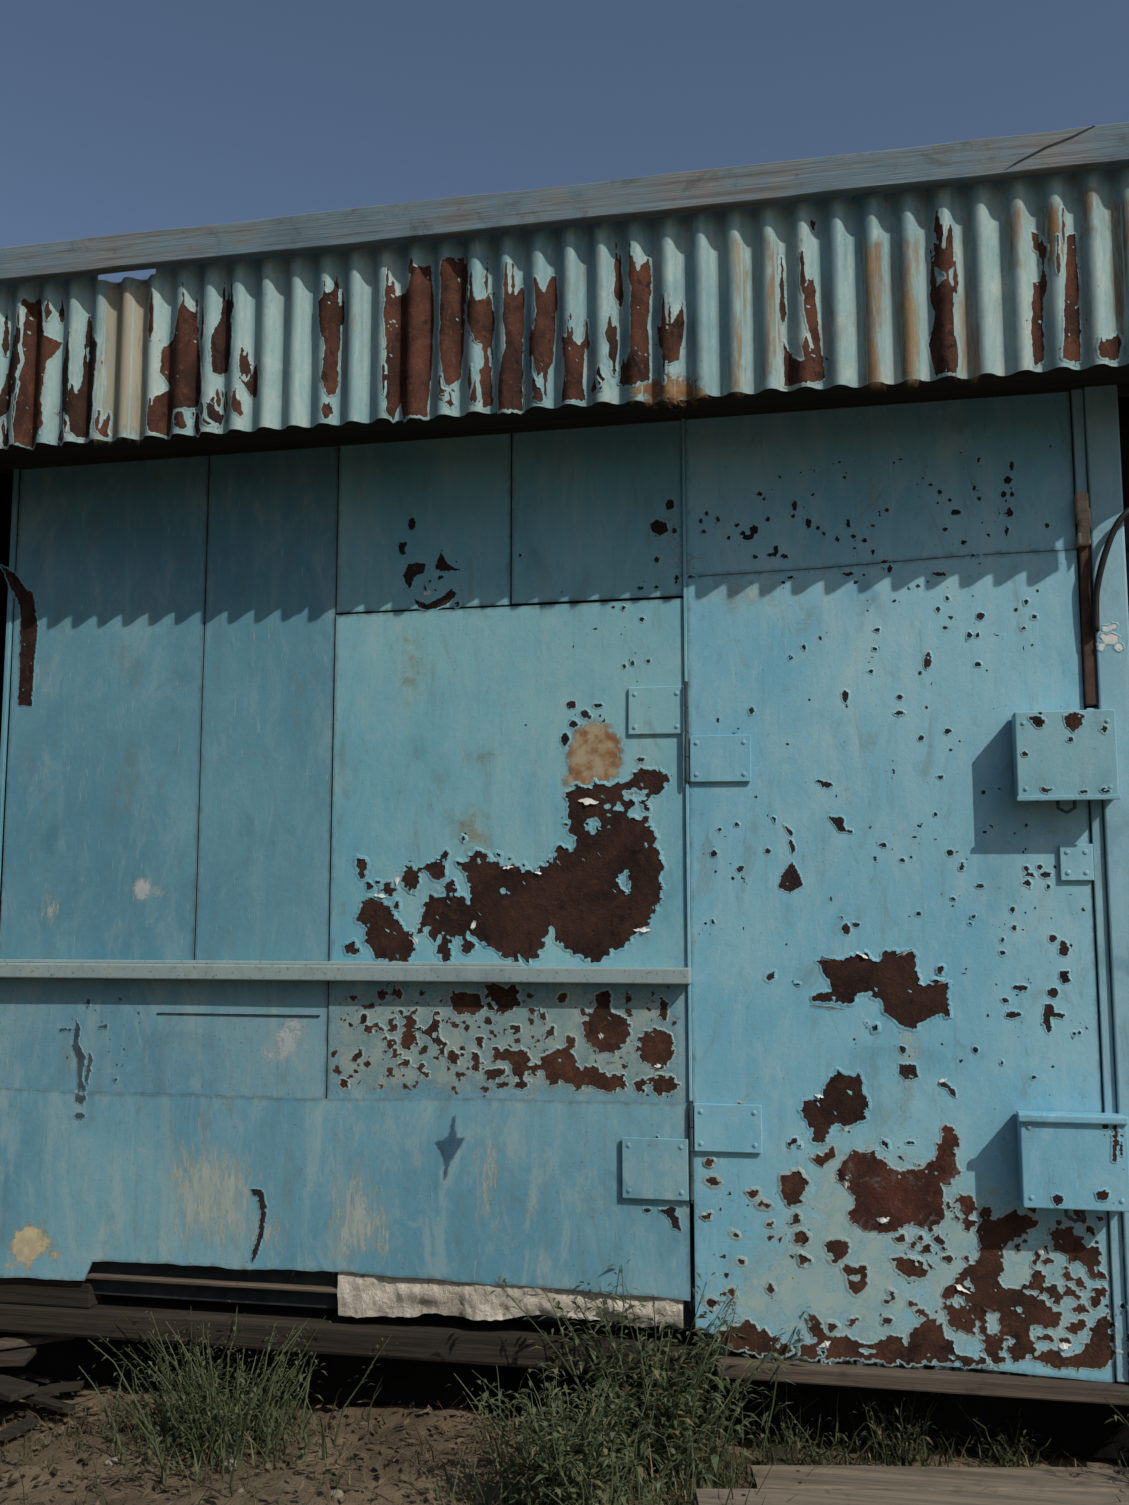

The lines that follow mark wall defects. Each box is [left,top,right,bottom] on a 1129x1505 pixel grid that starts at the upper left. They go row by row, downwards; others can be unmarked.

rust [1043,203,1063,266]
rust [1110,203,1129,336]
rust [99,283,149,438]
rust [629,371,705,404]
rust [865,243,880,383]
rust [902,292,916,376]
rust [564,722,623,788]
rust [1100,1124,1125,1170]
rust [1050,1192,1065,1208]
rust [1093,1187,1114,1204]